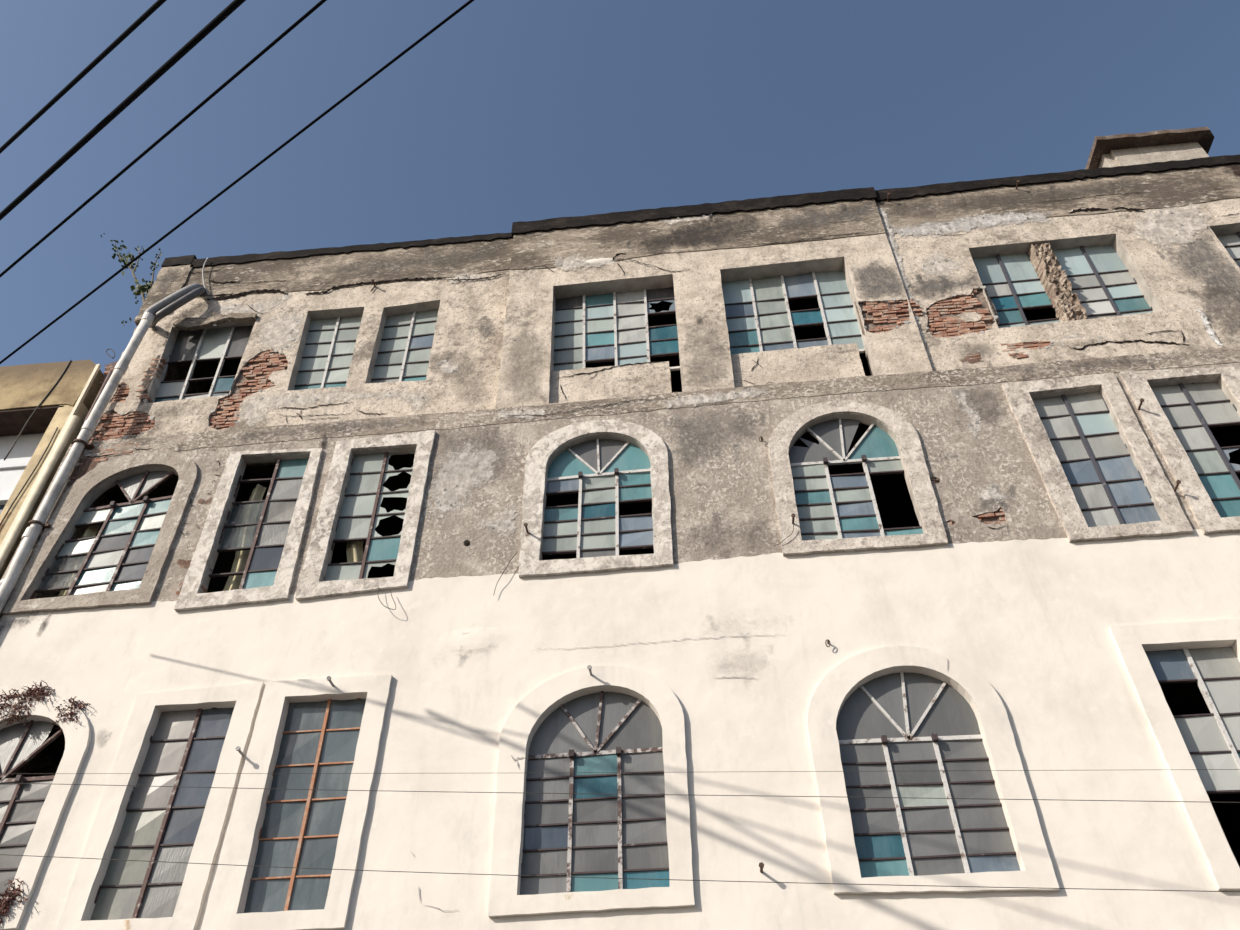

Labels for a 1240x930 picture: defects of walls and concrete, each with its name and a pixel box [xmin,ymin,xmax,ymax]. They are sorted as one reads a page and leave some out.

crack [1032,192,1143,213]
damp [628,216,755,249]
crack [192,265,557,314]
spalling [854,207,1053,343]
damp [1161,230,1240,334]
spalling [172,294,430,430]
spalling [961,352,982,363]
spalling [1000,335,1103,359]
crack [1067,330,1189,350]
spalling [67,355,167,487]
spalling [974,483,1008,524]